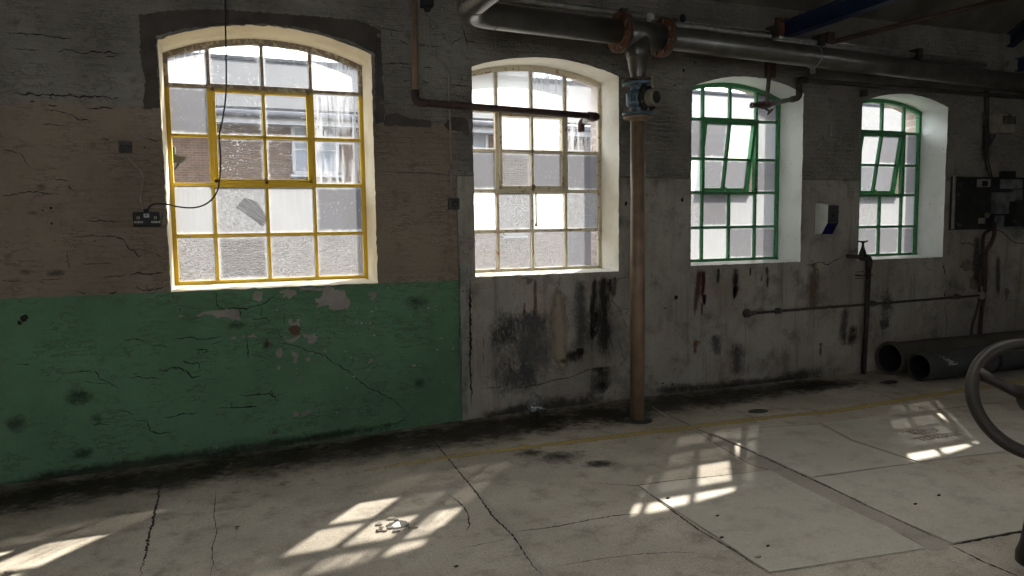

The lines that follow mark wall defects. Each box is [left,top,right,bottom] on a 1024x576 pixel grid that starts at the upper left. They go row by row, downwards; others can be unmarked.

crack [6,33,117,57]
peeling [138,9,469,137]
crack [11,92,117,140]
crack [4,219,165,294]
peeling [196,309,241,321]
crack [65,292,411,434]
peeling [271,286,389,374]
leakage [484,277,612,417]
corrosion [694,272,705,314]
leakage [24,425,386,482]
crack [140,474,164,576]
crack [209,492,217,575]